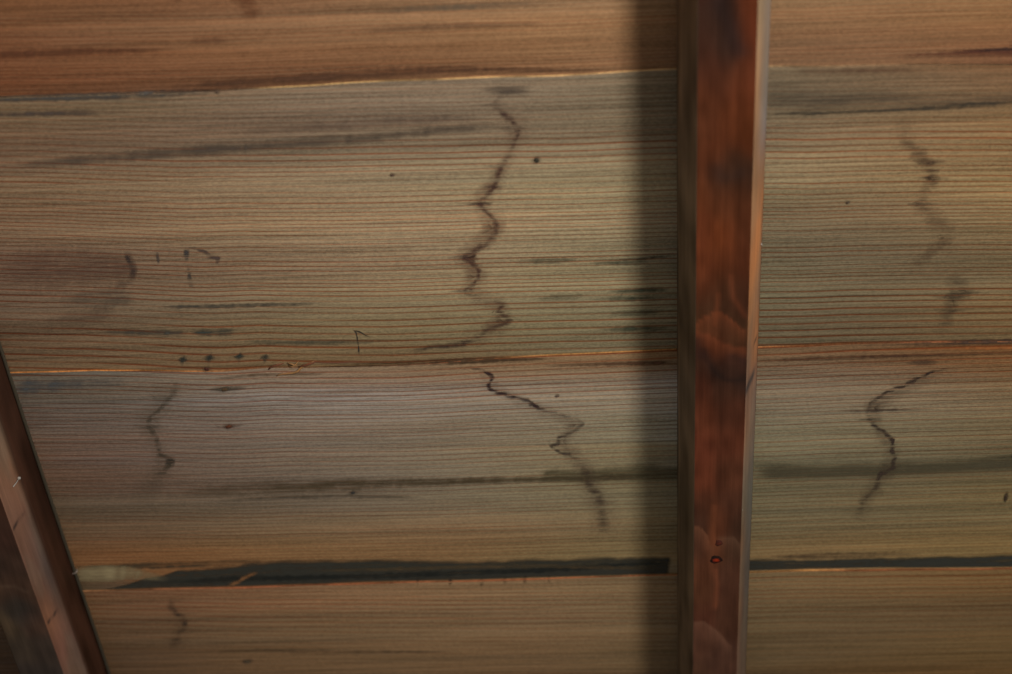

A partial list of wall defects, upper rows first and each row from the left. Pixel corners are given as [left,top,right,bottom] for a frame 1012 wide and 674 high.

water stain [860,339,1012,411]
water stain [765,425,1012,489]